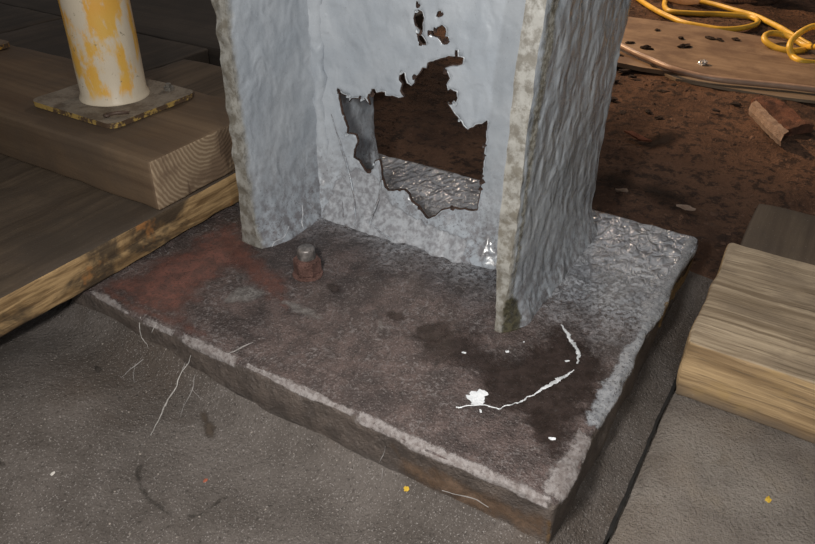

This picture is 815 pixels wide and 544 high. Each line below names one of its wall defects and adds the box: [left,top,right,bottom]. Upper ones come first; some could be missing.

damp [417,322,605,453]